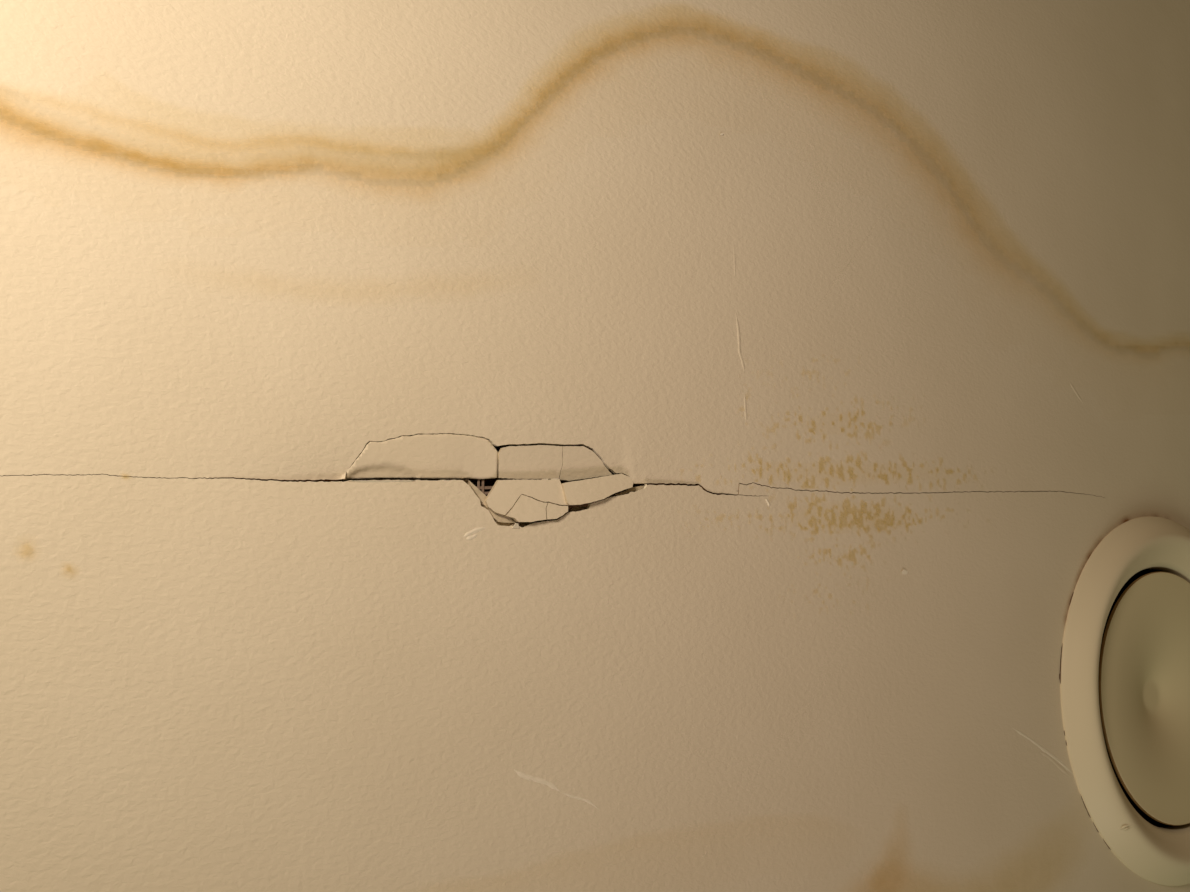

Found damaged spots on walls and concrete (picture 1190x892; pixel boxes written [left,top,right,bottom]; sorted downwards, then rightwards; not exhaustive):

damp [411,22,833,181]
damp [0,103,316,178]
crack [3,474,342,482]
flaking render [341,433,647,540]
damp [753,458,911,487]
crack [640,482,1105,498]
damp [788,501,921,534]